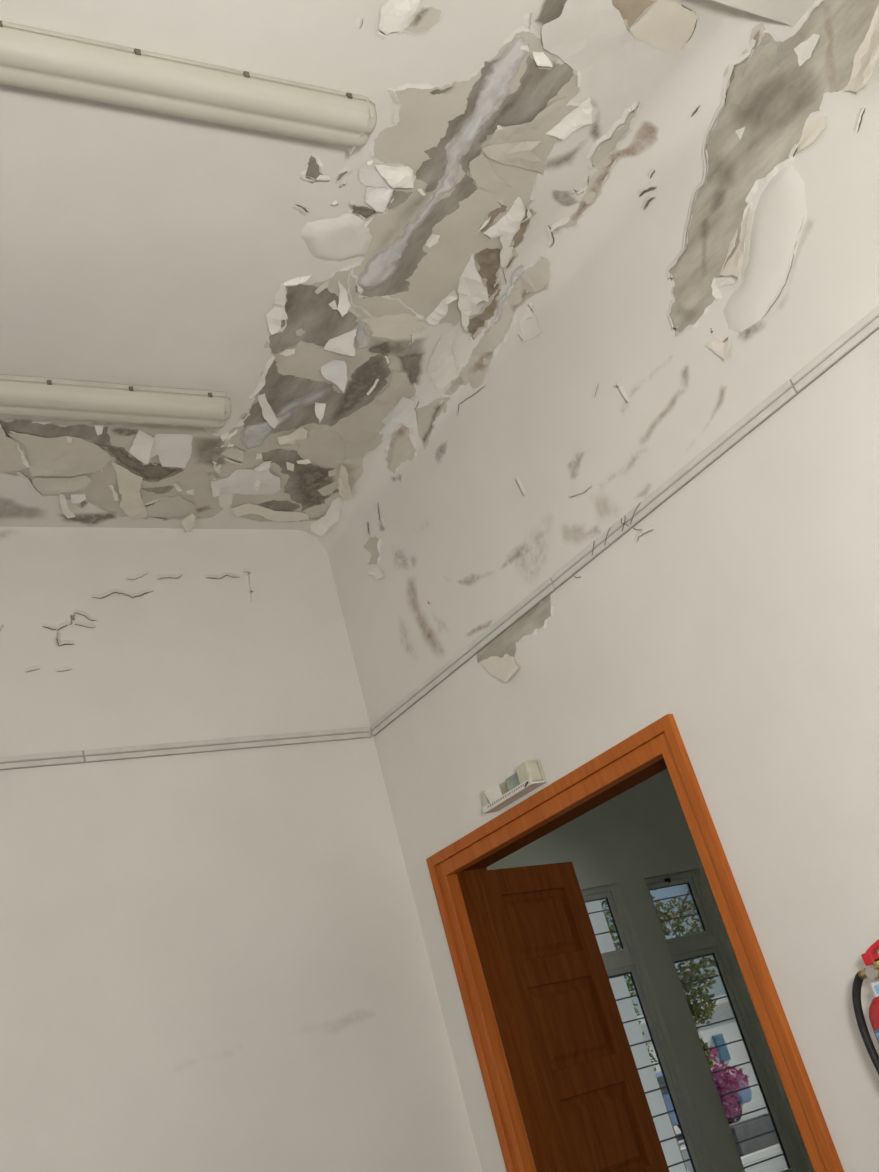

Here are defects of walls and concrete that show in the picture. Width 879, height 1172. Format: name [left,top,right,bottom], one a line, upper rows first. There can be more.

peeling [0,0,697,536]
peeling [665,0,879,360]
crack [24,568,254,672]
peeling [476,594,554,682]